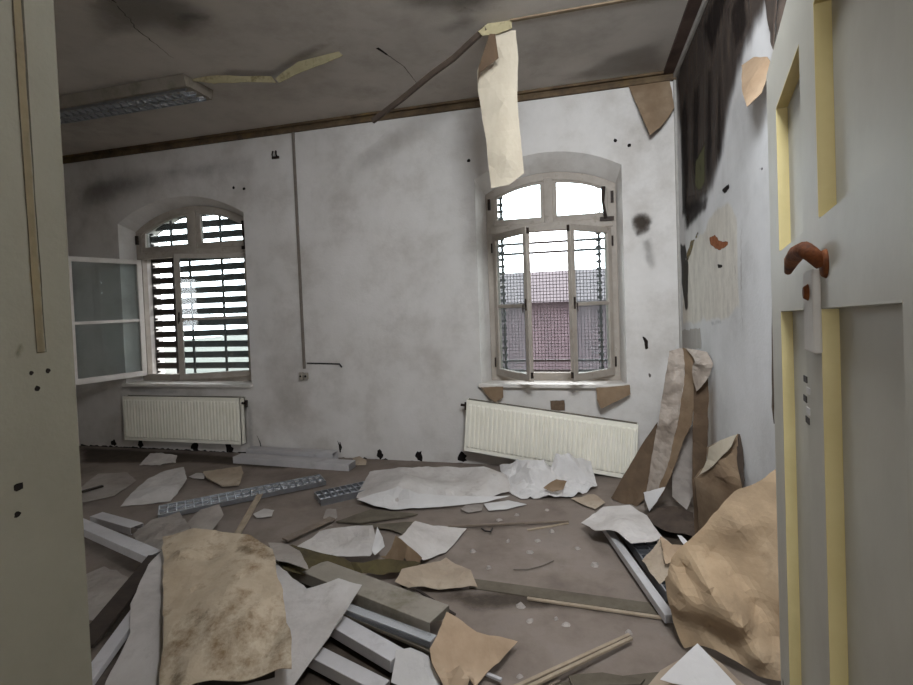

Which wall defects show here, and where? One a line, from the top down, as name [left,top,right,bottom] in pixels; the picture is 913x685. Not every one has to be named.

peeling [478,20,512,36]
water stain [676,0,764,227]
water stain [633,215,650,234]
flaking render [682,184,744,345]